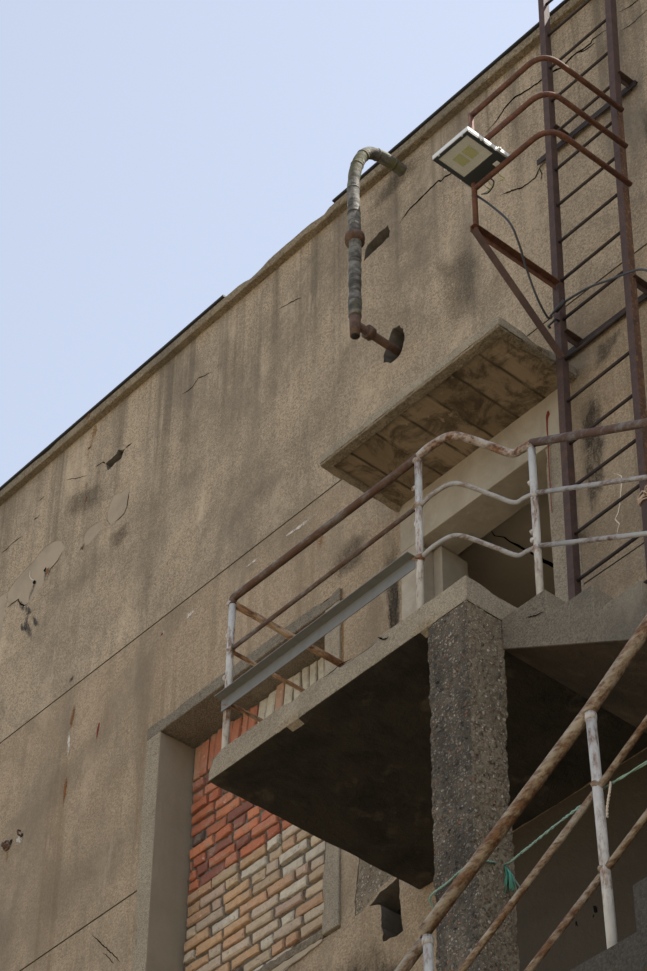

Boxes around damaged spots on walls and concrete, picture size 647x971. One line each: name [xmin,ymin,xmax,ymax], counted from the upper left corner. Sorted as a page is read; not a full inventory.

crack [485,0,647,133]